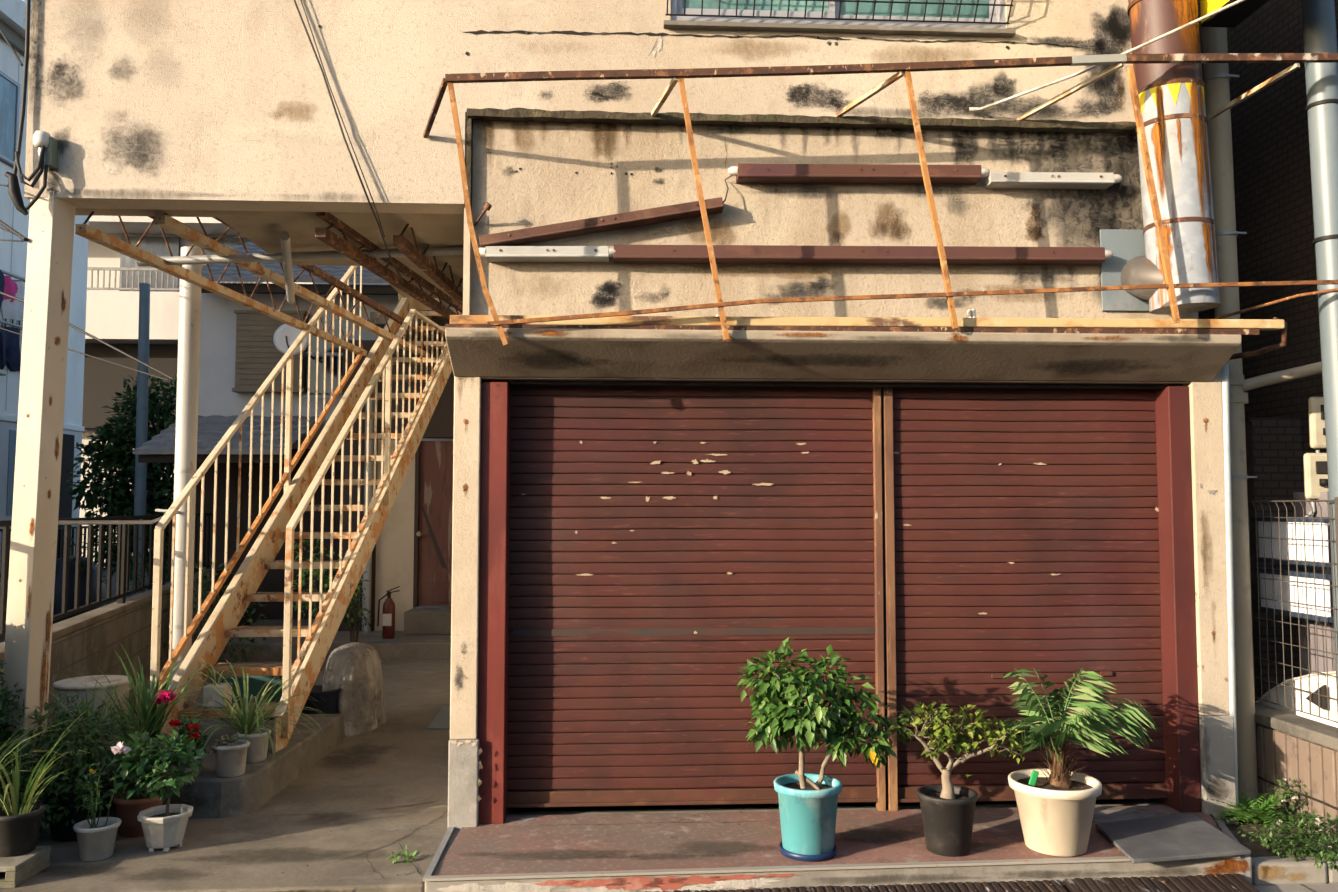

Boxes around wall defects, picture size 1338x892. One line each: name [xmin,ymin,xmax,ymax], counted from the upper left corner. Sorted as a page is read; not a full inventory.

corrosion [1174,0,1200,49]
crack [462,30,1082,55]
water stain [29,48,76,94]
water stain [587,83,630,102]
water stain [54,135,68,152]
water stain [112,130,158,163]
water stain [787,8,1144,247]
water stain [769,185,831,197]
corrosion [1151,83,1217,278]
water stain [590,282,620,308]
peeling [651,442,730,476]